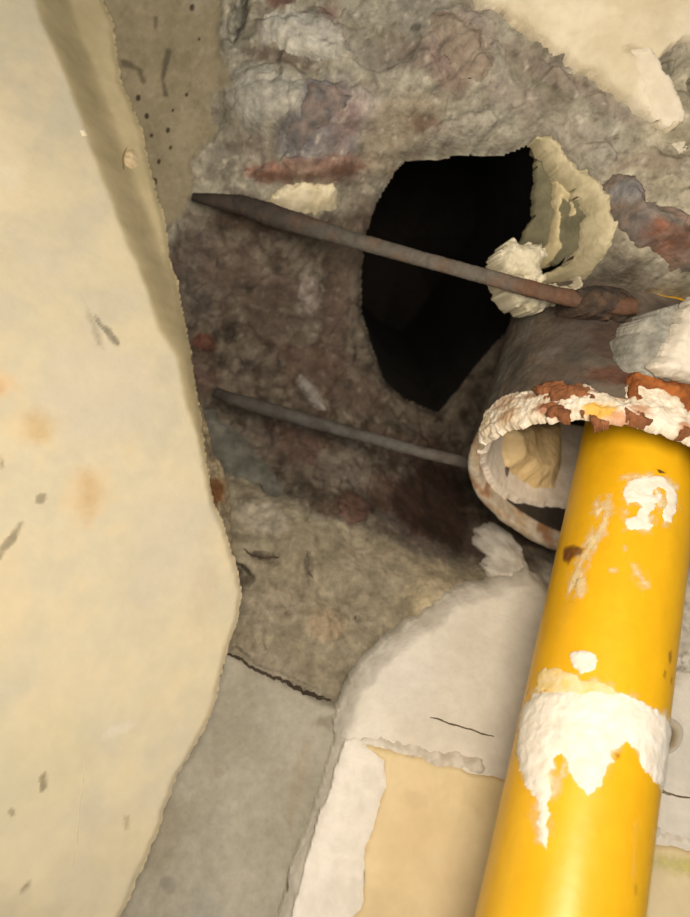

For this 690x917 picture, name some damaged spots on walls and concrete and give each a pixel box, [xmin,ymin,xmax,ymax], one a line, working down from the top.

spalling [166,0,690,585]
corrosion [533,380,610,434]
corrosion [625,372,690,430]
corrosion [674,425,690,441]
flaking render [676,563,690,674]
crack [227,653,331,702]
peeling [291,737,486,917]